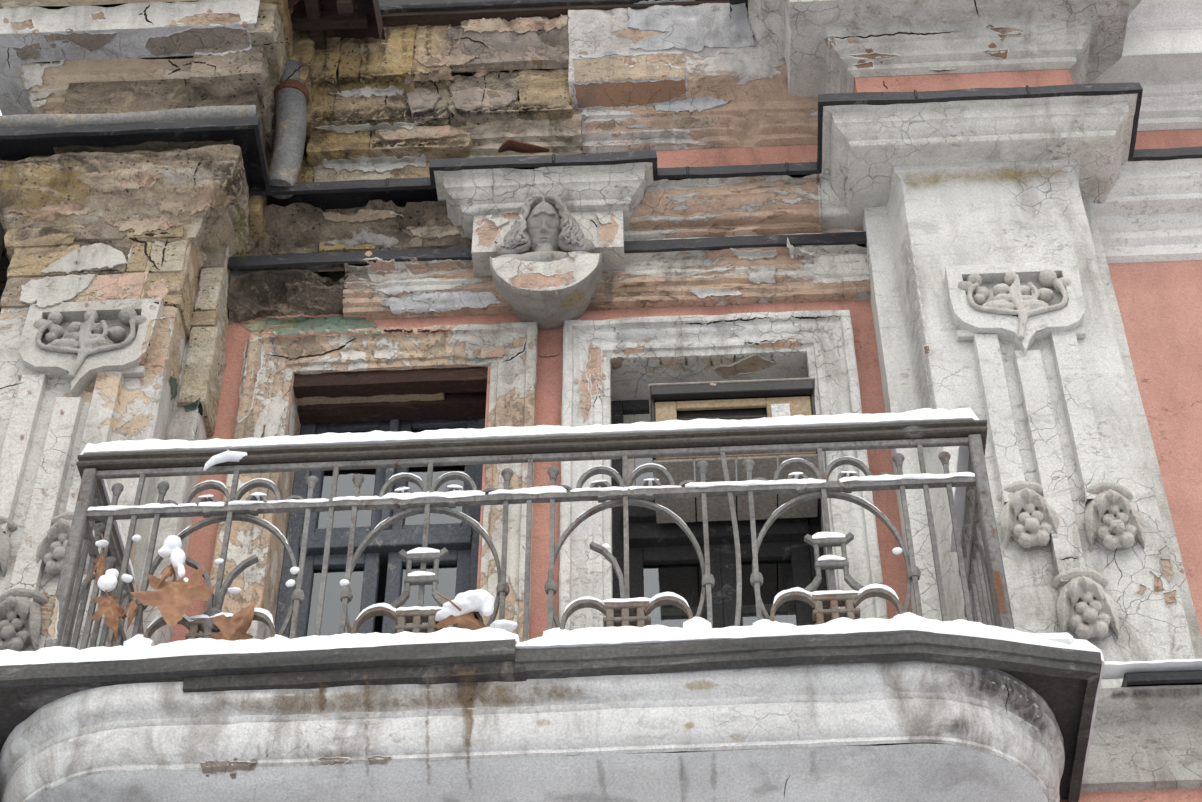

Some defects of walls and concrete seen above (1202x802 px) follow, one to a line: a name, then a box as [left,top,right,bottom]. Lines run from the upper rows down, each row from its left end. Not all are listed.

peeling [3,10,118,107]
peeling [144,9,252,59]
crack [835,0,1025,40]
spalling [287,0,756,183]
spalling [0,143,523,441]
peeling [505,251,576,294]
peeling [688,238,870,299]
peeling [40,592,59,640]
water stain [276,669,563,746]